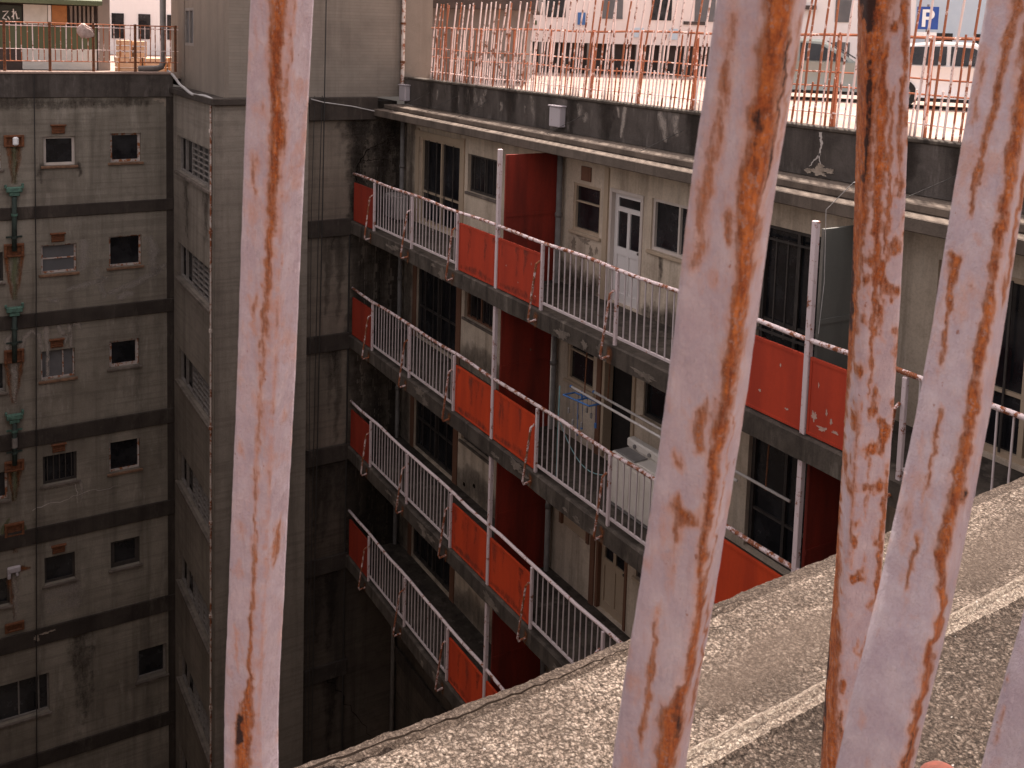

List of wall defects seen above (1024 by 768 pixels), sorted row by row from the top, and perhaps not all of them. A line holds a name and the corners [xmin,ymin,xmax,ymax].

damp [602,100,627,137]
damp [658,112,700,147]
peeling [811,410,845,435]